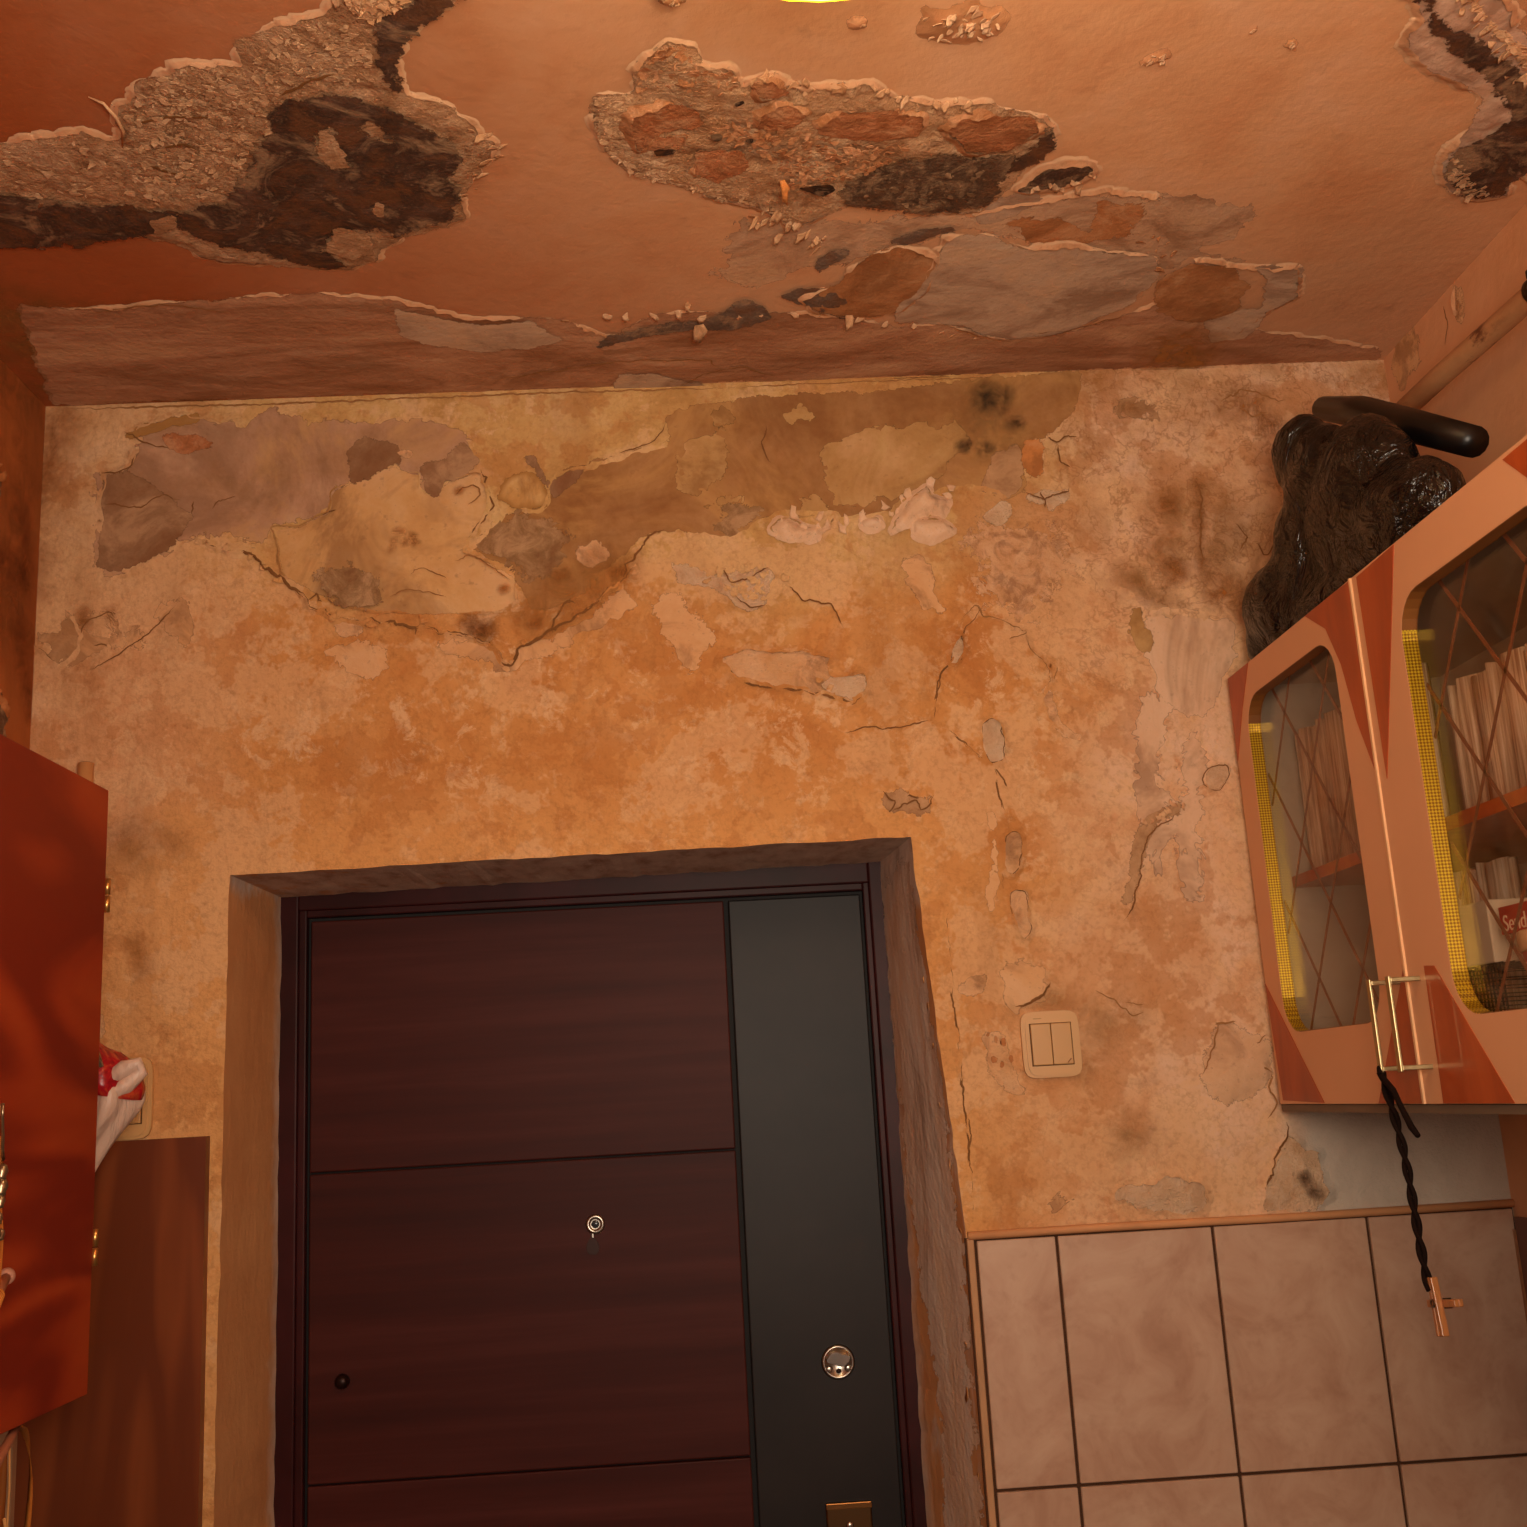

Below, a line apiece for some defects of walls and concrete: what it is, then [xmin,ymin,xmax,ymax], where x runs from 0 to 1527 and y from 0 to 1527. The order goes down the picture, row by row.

spalling [0,0,509,272]
spalling [1393,0,1527,204]
peeling [16,37,1421,710]
crack [194,529,664,667]
crack [459,472,495,551]
spalling [0,688,11,737]
peeling [882,788,934,817]
crack [848,603,1064,889]
peeling [1111,585,1238,917]
crack [943,913,974,1222]
spalling [1251,1125,1338,1214]